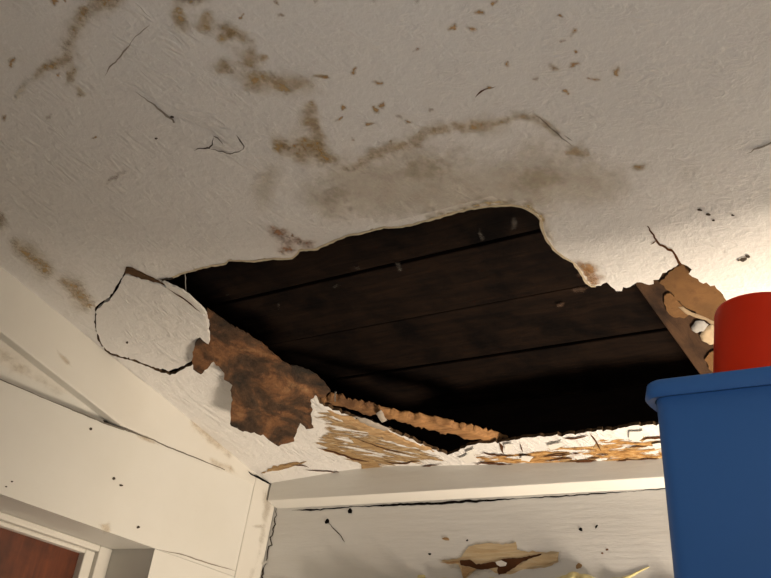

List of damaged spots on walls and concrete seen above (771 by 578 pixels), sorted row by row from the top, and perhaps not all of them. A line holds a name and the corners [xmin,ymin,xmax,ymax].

crack [105,26,148,75]
crack [194,135,245,154]
spalling [172,204,596,287]
crack [647,226,682,266]
flaking render [124,267,166,286]
flaking render [659,264,727,372]
peeling [262,461,335,473]
peeling [315,410,443,469]
peeling [459,430,662,465]
crack [261,508,277,578]